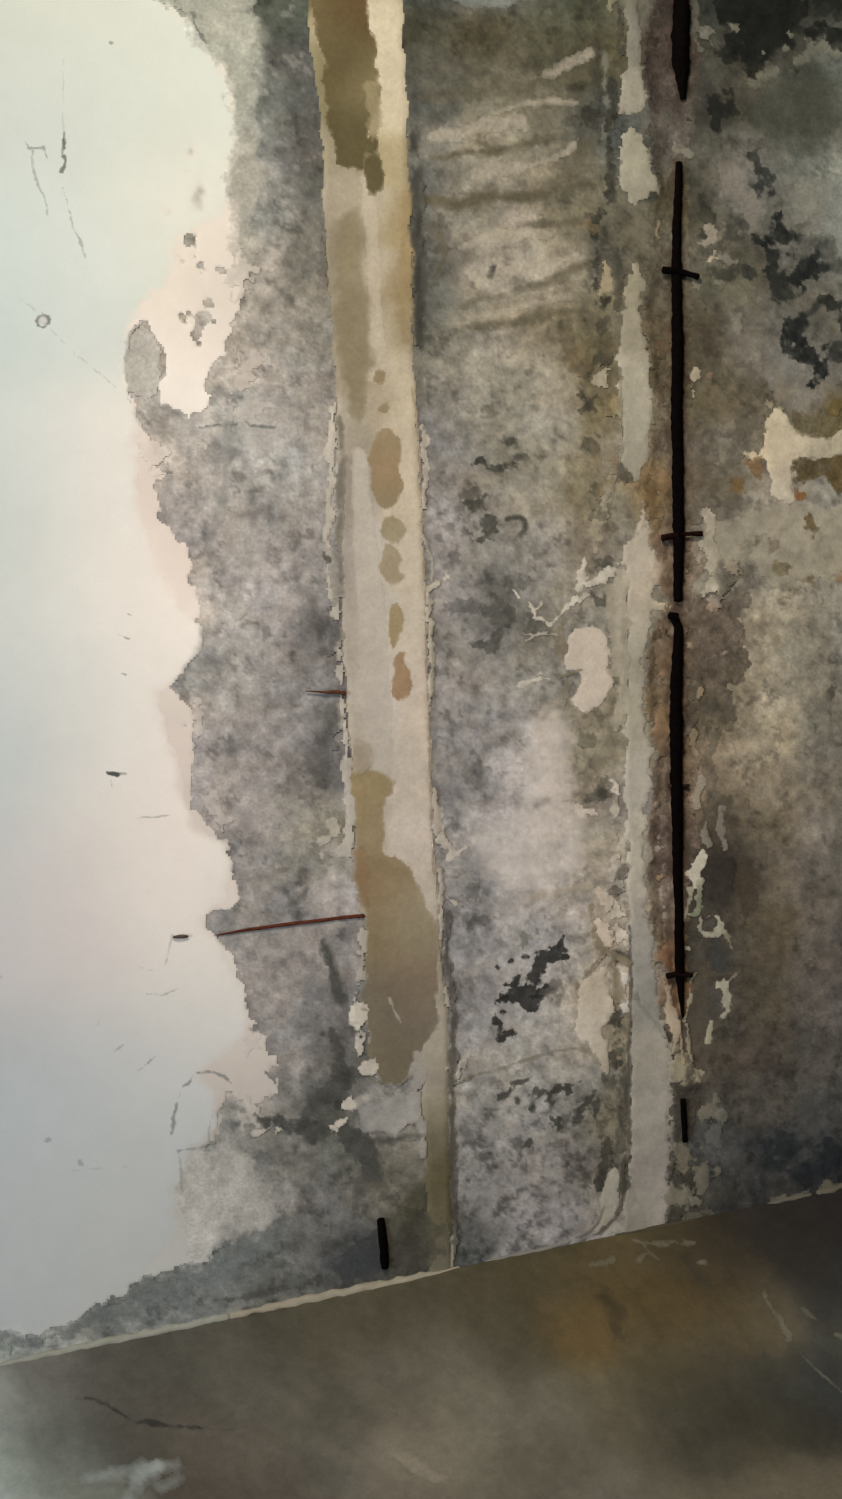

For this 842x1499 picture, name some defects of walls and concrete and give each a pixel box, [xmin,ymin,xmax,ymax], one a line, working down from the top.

rust [666,0,695,110]
leakage [311,0,634,705]
leakage [684,0,842,524]
spalling [564,0,842,981]
peeling [0,0,358,1336]
rust [645,156,697,1024]
peeling [574,967,616,1076]
leakage [329,1208,457,1282]
peeling [598,1167,620,1231]
leakage [708,1128,842,1313]
leakage [78,1456,314,1499]
leakage [654,1407,842,1499]